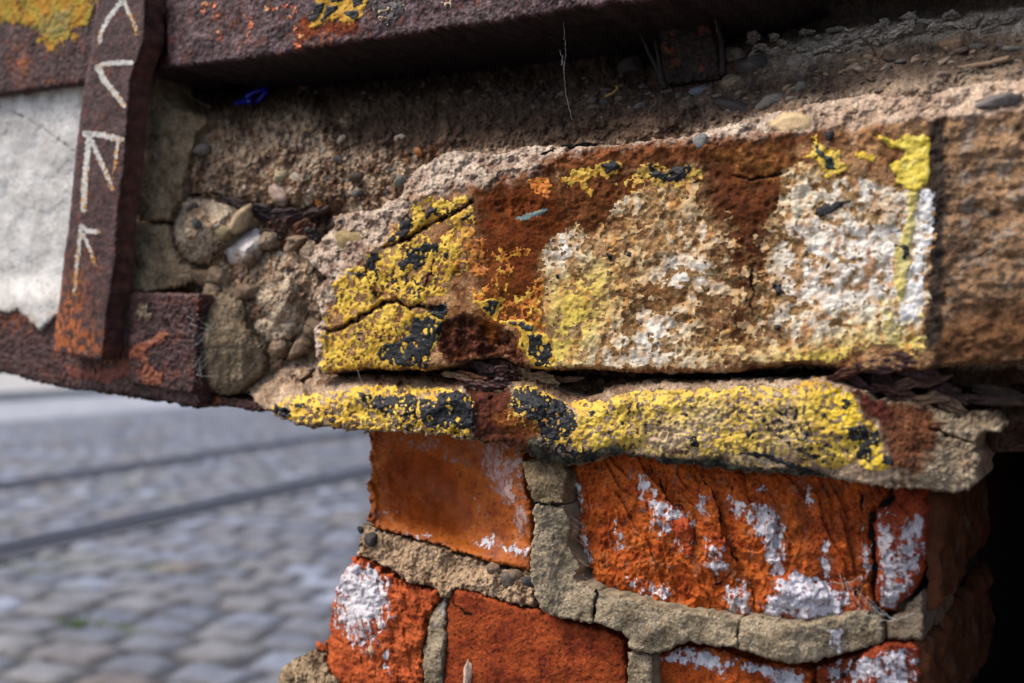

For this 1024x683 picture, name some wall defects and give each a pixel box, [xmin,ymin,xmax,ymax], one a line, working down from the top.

corrosion [200,1,223,41]
corrosion [264,4,358,51]
crack [384,201,471,248]
crack [321,260,434,332]
damp [386,436,850,619]
damp [859,507,925,611]
damp [333,563,399,653]
damp [659,646,804,683]
damp [818,629,920,683]